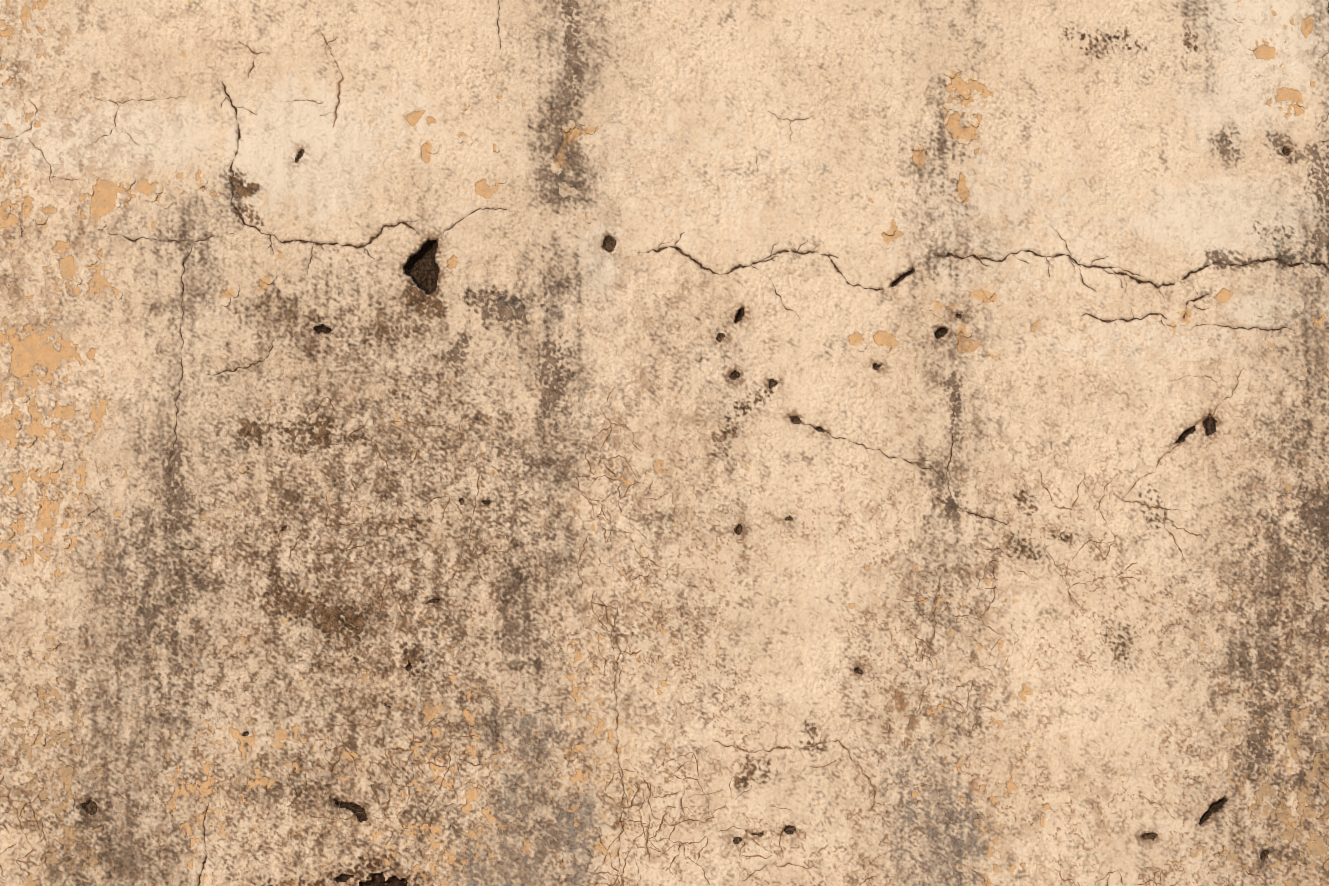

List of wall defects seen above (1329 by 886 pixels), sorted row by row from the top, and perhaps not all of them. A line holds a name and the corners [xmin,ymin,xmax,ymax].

damp [539,0,600,213]
damp [1254,132,1329,263]
crack [109,33,506,512]
spalling [403,240,457,295]
crack [639,232,883,314]
crack [935,231,1329,331]
peeling [0,320,107,449]
damp [917,372,976,480]
peeling [0,456,98,577]
crack [790,368,1244,737]
damp [1227,612,1309,775]
peeling [333,701,507,886]